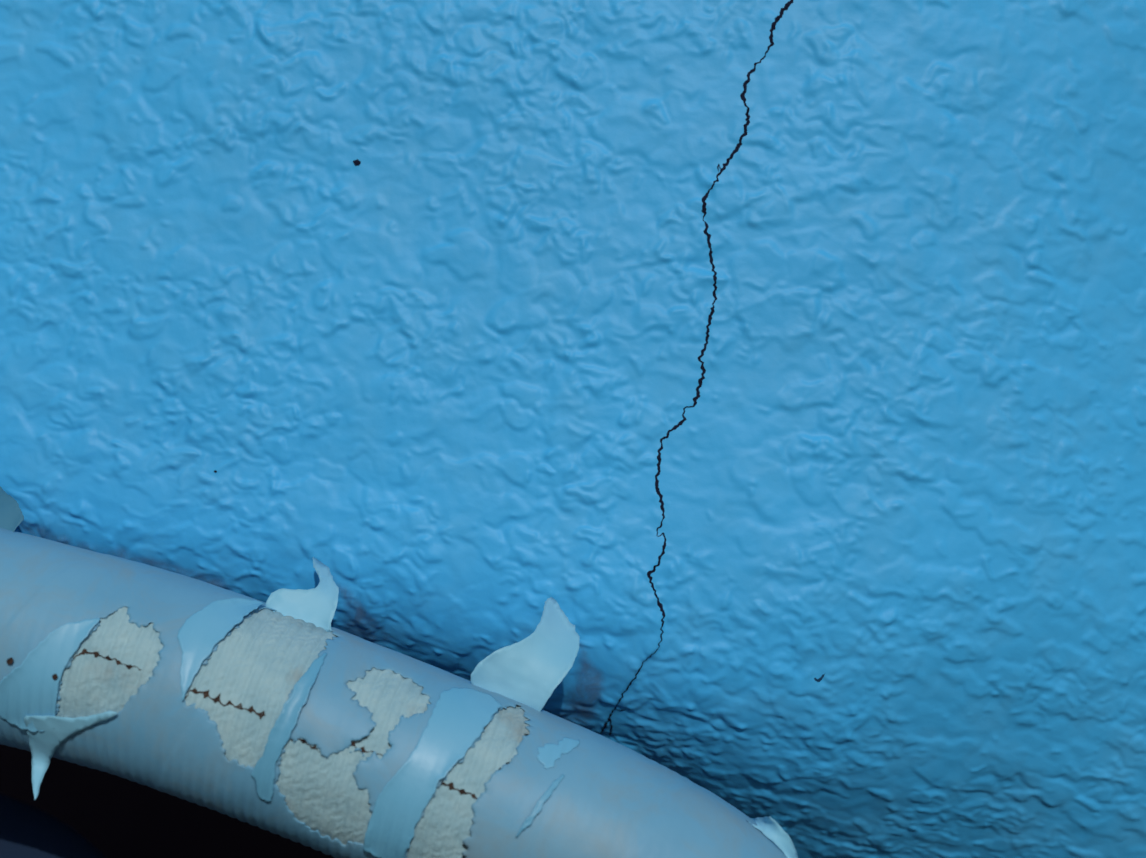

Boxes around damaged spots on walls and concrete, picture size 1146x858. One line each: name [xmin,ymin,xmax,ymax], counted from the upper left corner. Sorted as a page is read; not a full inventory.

crack [600,0,793,735]